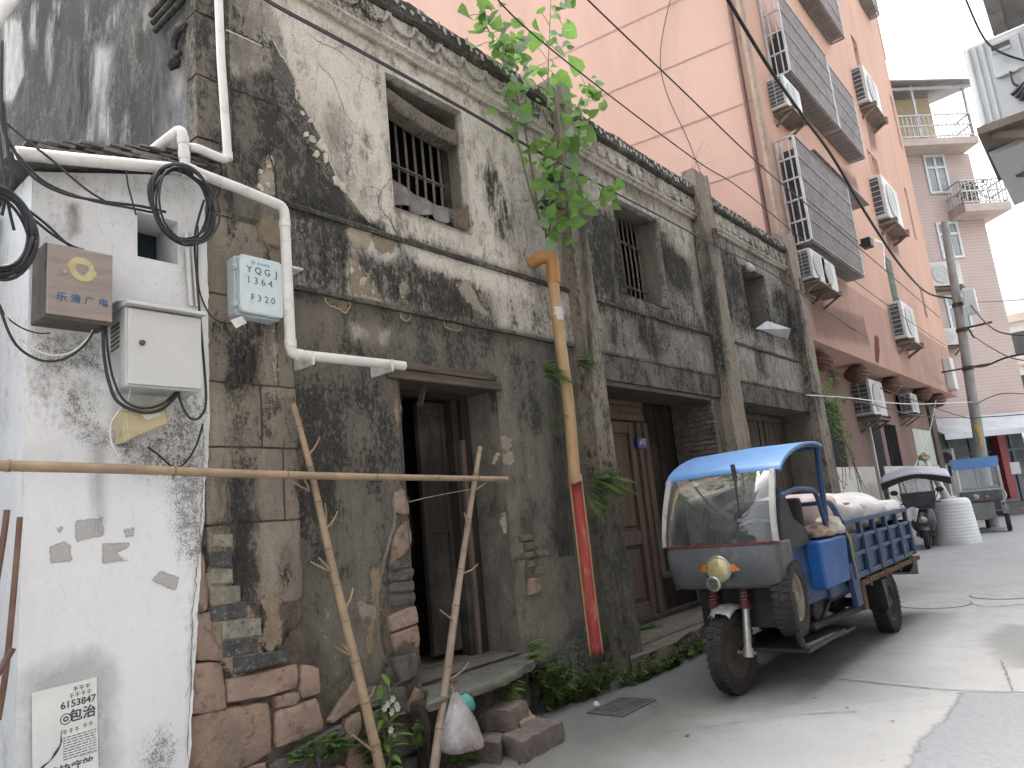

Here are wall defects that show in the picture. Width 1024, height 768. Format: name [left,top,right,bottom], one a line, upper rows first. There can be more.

crack [305,31,395,135]
peeling [256,154,277,197]
peeling [256,213,281,247]
peeling [270,39,396,254]
water stain [451,204,474,231]
water stain [295,232,473,319]
water stain [580,186,749,392]
water stain [60,386,99,441]
water stain [106,394,207,564]
peeling [49,517,134,563]
peeling [153,571,179,589]
spalling [205,520,290,677]